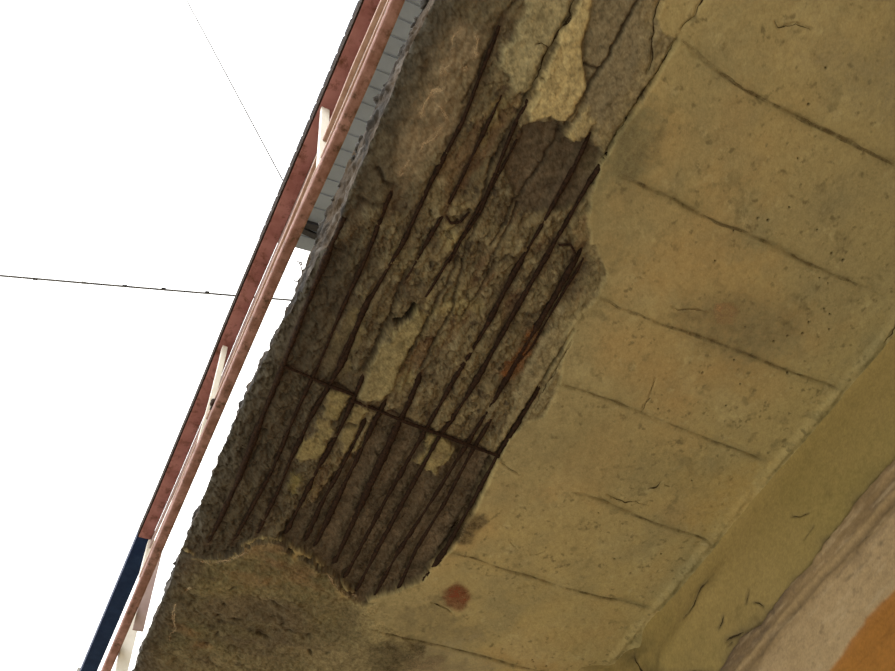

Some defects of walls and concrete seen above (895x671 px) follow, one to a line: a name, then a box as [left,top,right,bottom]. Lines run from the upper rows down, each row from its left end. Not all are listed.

spalling [182,0,676,602]
corrosion [445,585,469,609]